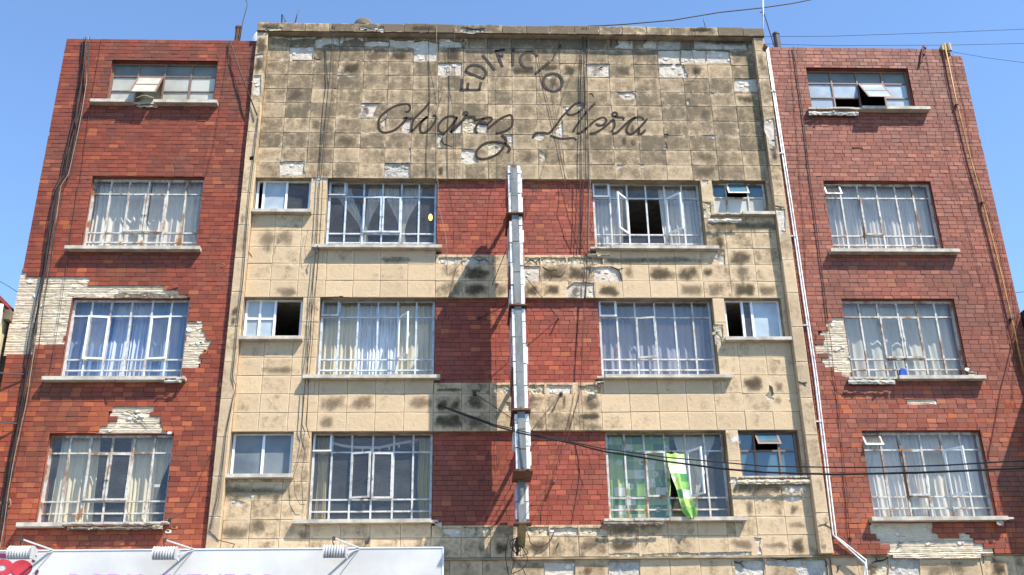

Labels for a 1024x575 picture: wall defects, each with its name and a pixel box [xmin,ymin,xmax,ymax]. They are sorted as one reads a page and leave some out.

spalling [266,27,485,76]
spalling [587,64,610,77]
spalling [616,41,752,78]
spalling [437,118,513,164]
spalling [384,149,411,178]
spalling [524,253,622,298]
spalling [111,285,183,299]
spalling [434,521,491,538]
spalling [526,521,664,537]